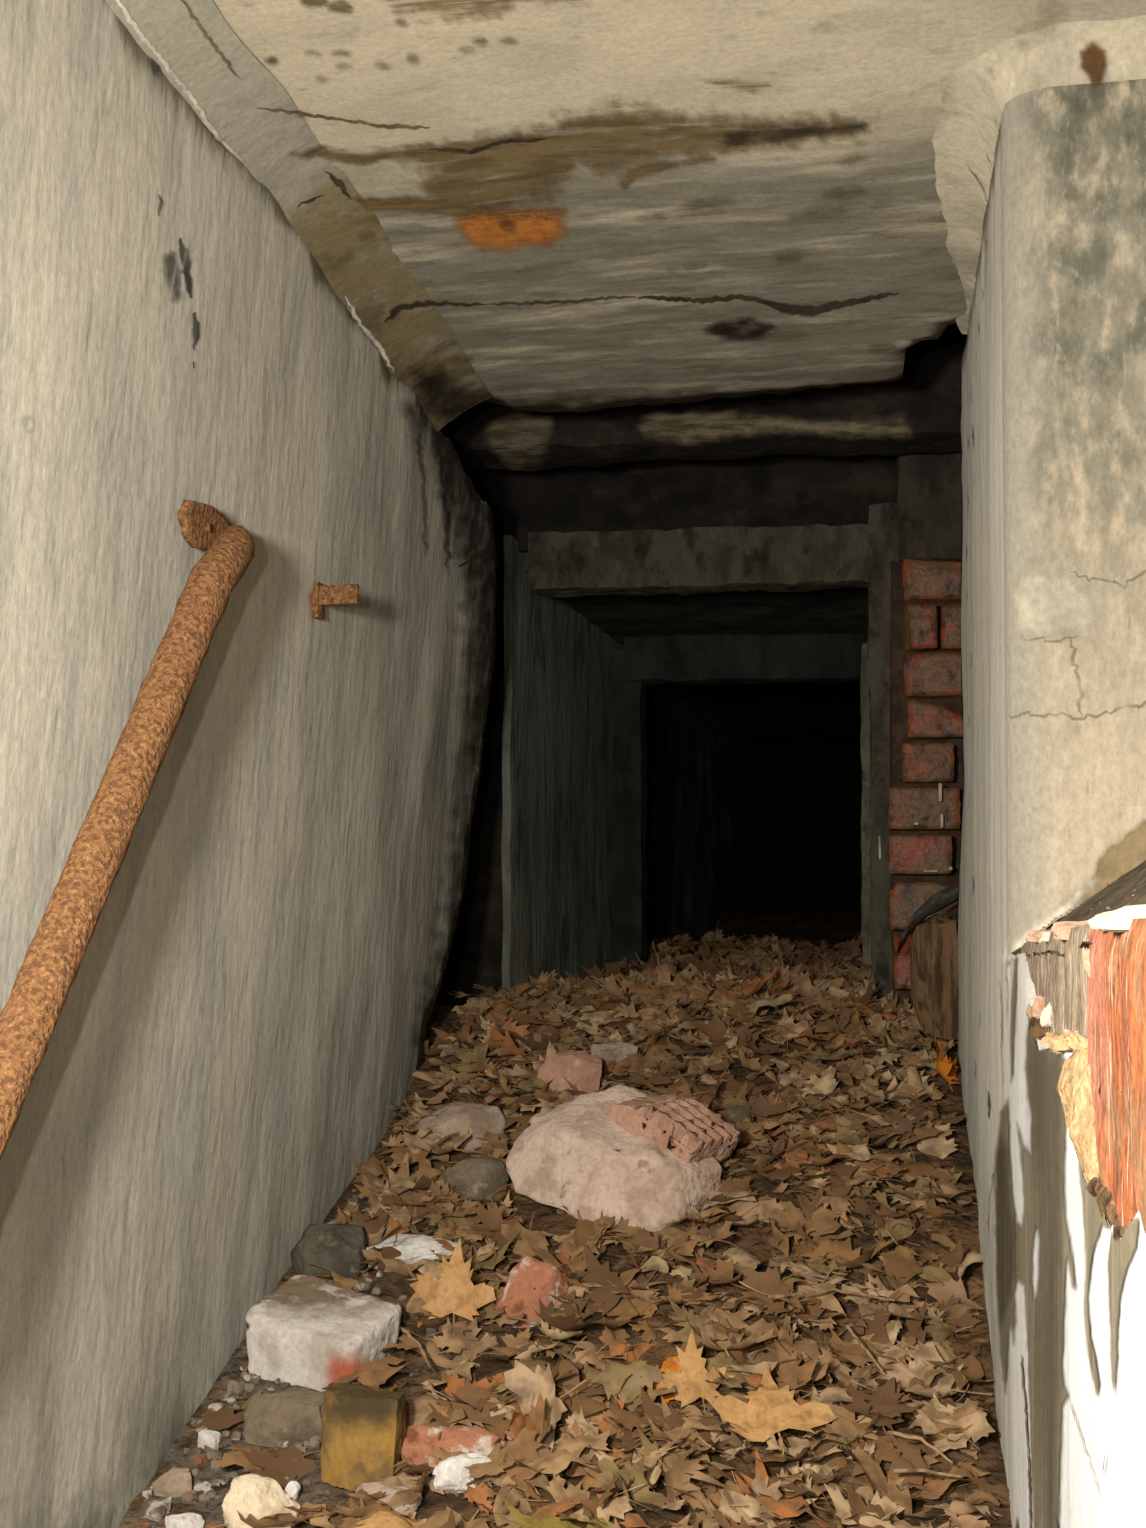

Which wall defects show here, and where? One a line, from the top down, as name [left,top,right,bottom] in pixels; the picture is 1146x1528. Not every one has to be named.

water stain [302,0,352,12]
water stain [391,0,509,24]
rust [1081,43,1106,86]
water stain [770,128,828,141]
water stain [300,137,547,165]
water stain [620,158,715,188]
rust [457,211,563,249]
crack [384,292,899,322]
spalling [1004,821,1146,1241]
water stain [995,957,1138,1528]